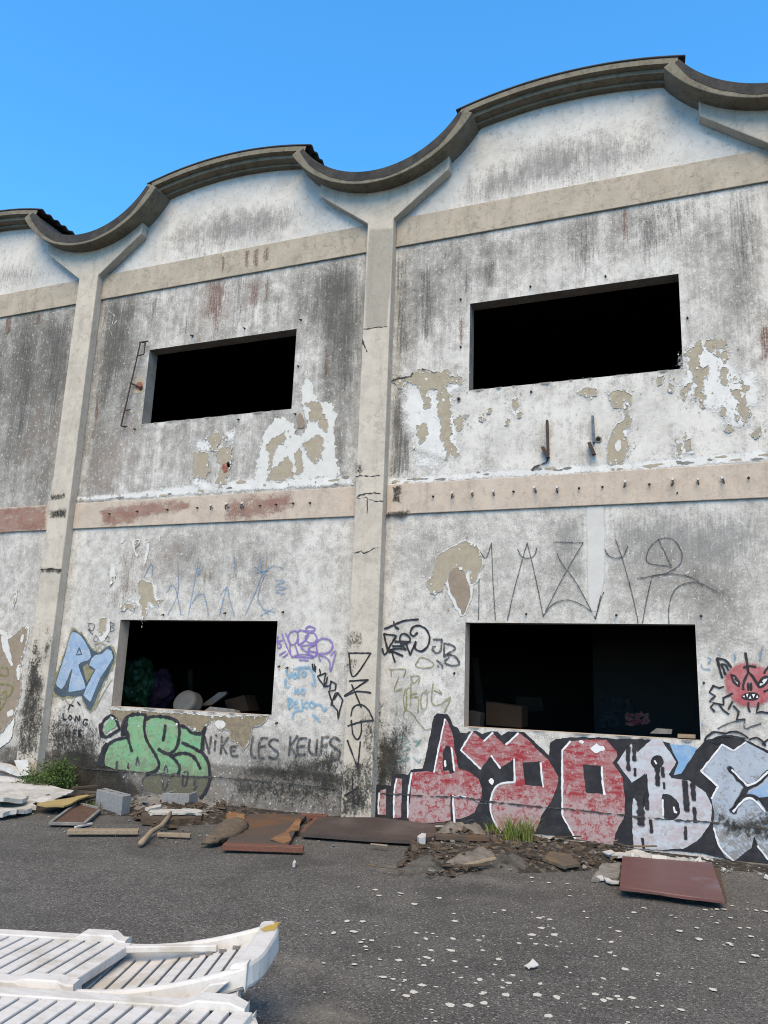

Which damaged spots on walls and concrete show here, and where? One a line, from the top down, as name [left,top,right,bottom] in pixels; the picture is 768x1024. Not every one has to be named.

peeling [77,376,353,502]
peeling [387,333,768,485]
rust [0,507,46,532]
rust [101,501,189,526]
rust [228,494,291,519]
peeling [423,536,486,616]
peeling [0,623,29,748]
water stain [15,640,137,792]
water stain [231,709,411,817]